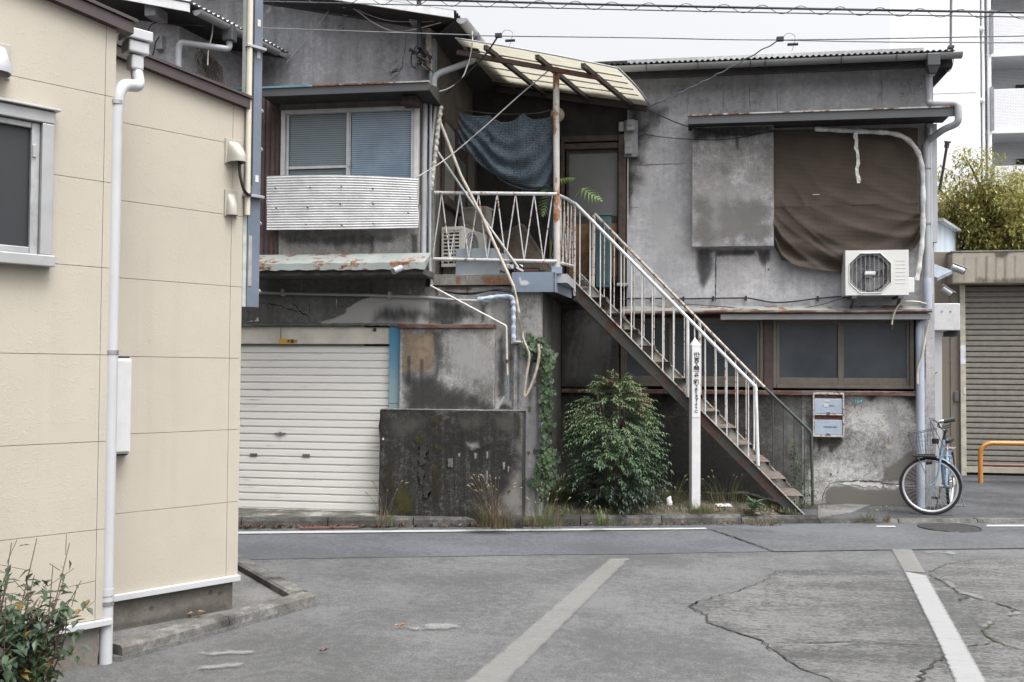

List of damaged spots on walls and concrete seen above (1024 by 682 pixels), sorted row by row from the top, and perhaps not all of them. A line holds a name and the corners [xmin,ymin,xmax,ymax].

leakage [696,186,770,285]
leakage [379,290,546,452]
leakage [501,472,546,517]
crack [688,528,946,682]
crack [801,558,1024,650]